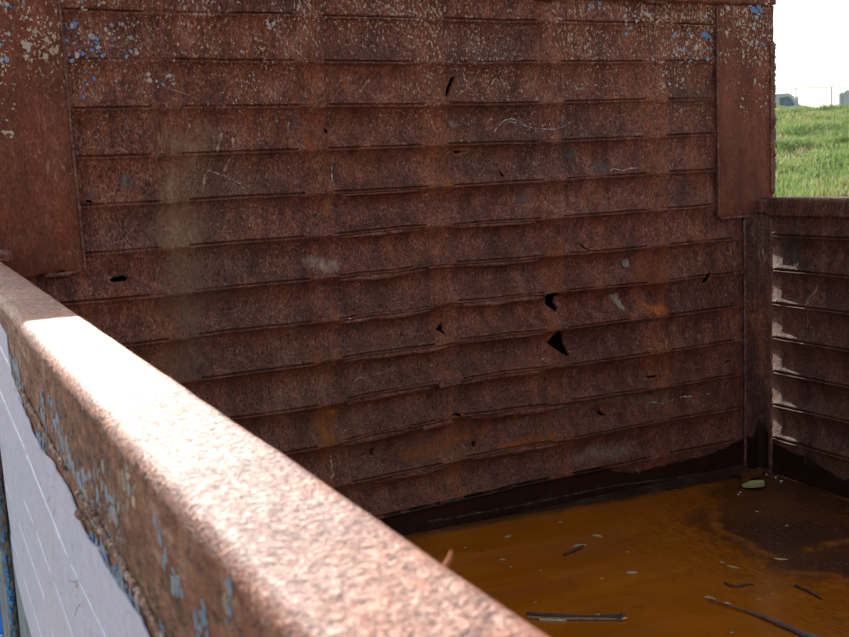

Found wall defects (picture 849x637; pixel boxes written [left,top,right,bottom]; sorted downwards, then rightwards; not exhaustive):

peeling [0,16,139,91]
peeling [660,0,771,113]
peeling [10,347,26,411]
peeling [36,389,140,614]
water stain [381,421,849,536]
peeling [153,515,184,599]
peeling [194,599,209,637]
peeling [223,577,233,625]